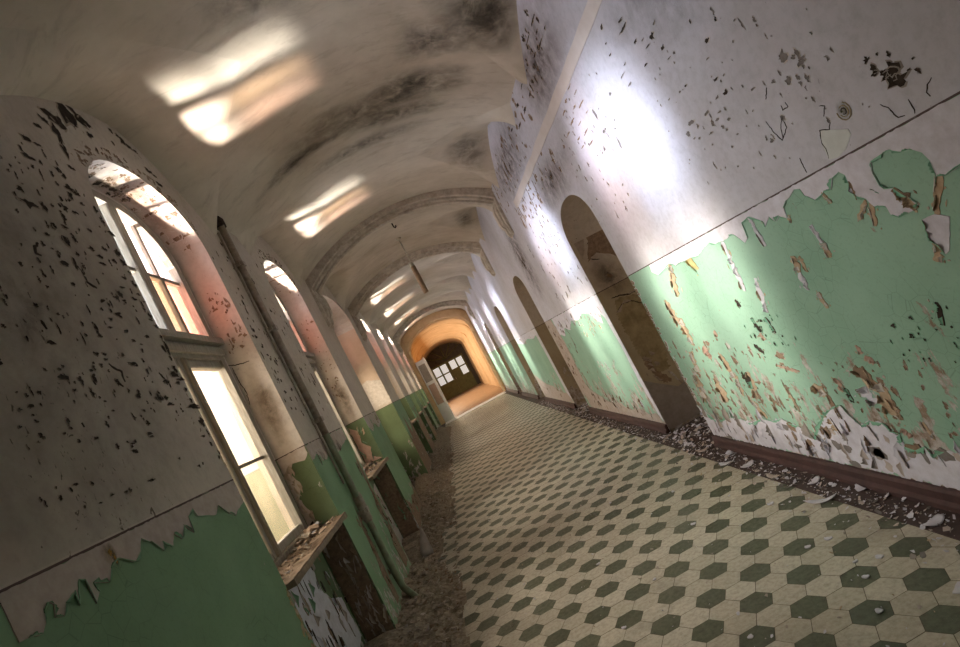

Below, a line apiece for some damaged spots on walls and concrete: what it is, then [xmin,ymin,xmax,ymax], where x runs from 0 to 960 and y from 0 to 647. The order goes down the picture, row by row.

water stain [525,33,551,93]
spalling [0,102,227,468]
peeling [491,9,960,552]
peeling [0,480,244,643]
spalling [286,525,394,647]
peeling [276,427,419,567]